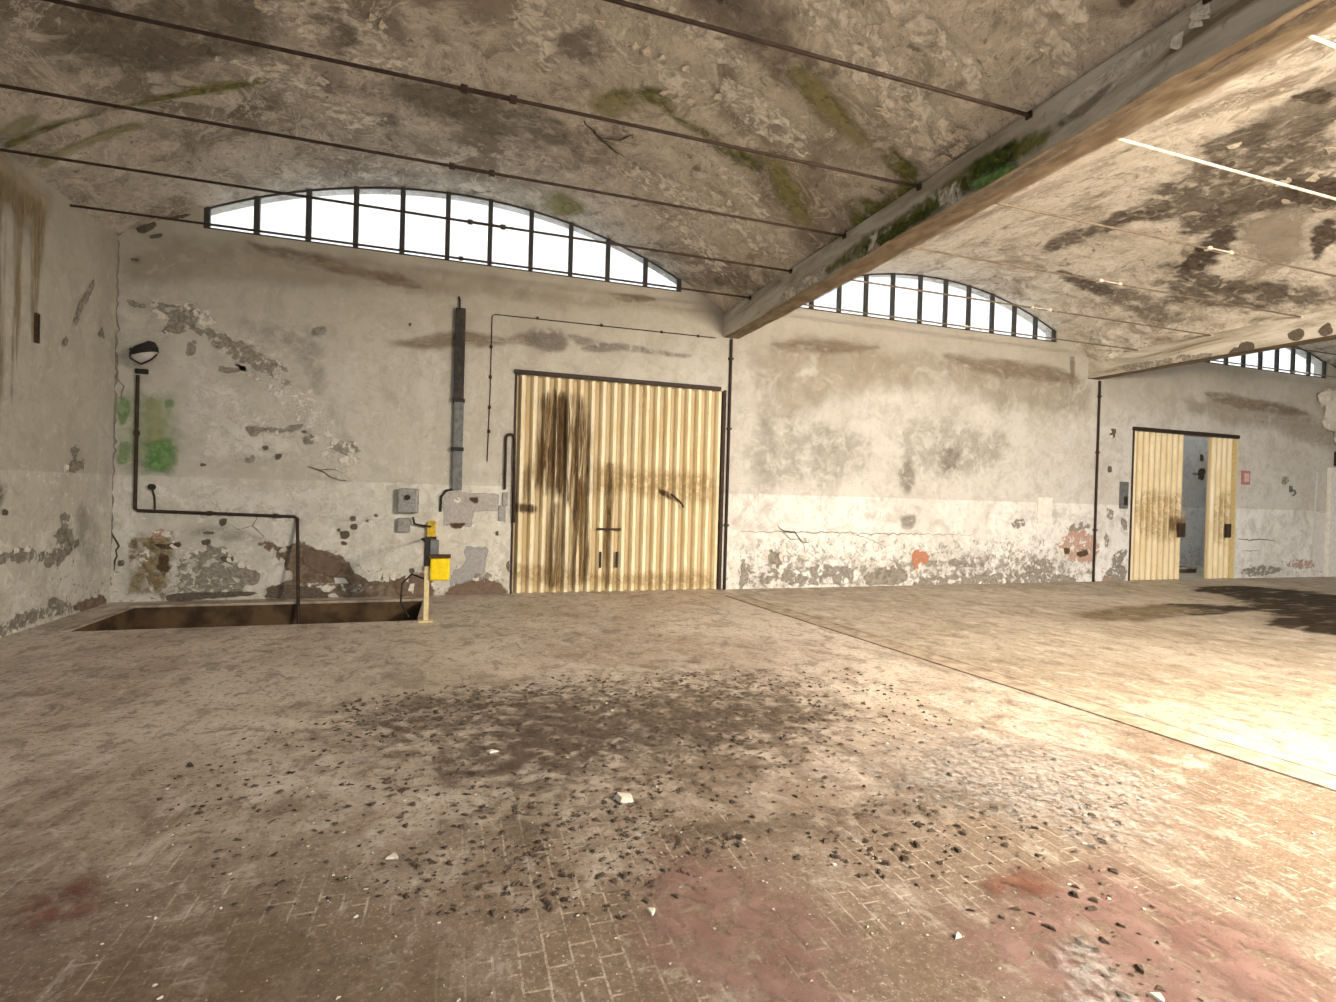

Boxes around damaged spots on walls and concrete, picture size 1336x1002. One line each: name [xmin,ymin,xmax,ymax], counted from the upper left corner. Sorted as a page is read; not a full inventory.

damp [694,0,826,84]
damp [725,0,1336,339]
peeling [127,297,358,486]
damp [780,341,866,352]
spalling [0,513,510,637]
peeling [739,508,1128,589]